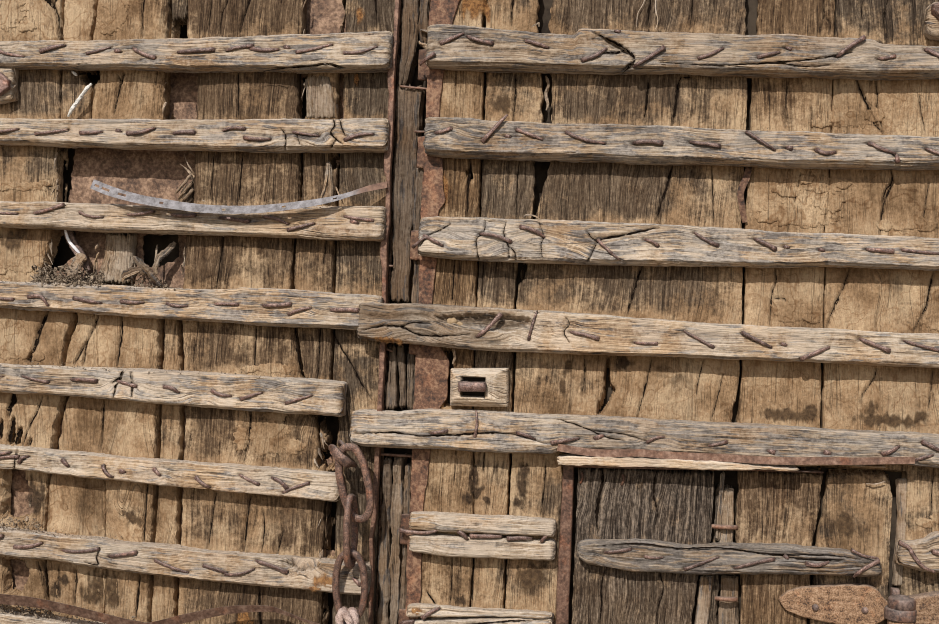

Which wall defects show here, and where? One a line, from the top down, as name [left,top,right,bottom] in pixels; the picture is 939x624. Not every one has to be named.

crack [599,35,635,72]
crack [642,83,650,117]
crack [667,55,837,124]
crack [29,314,48,361]
crack [365,322,466,337]
crack [0,394,43,465]
corrosion [308,574,333,591]